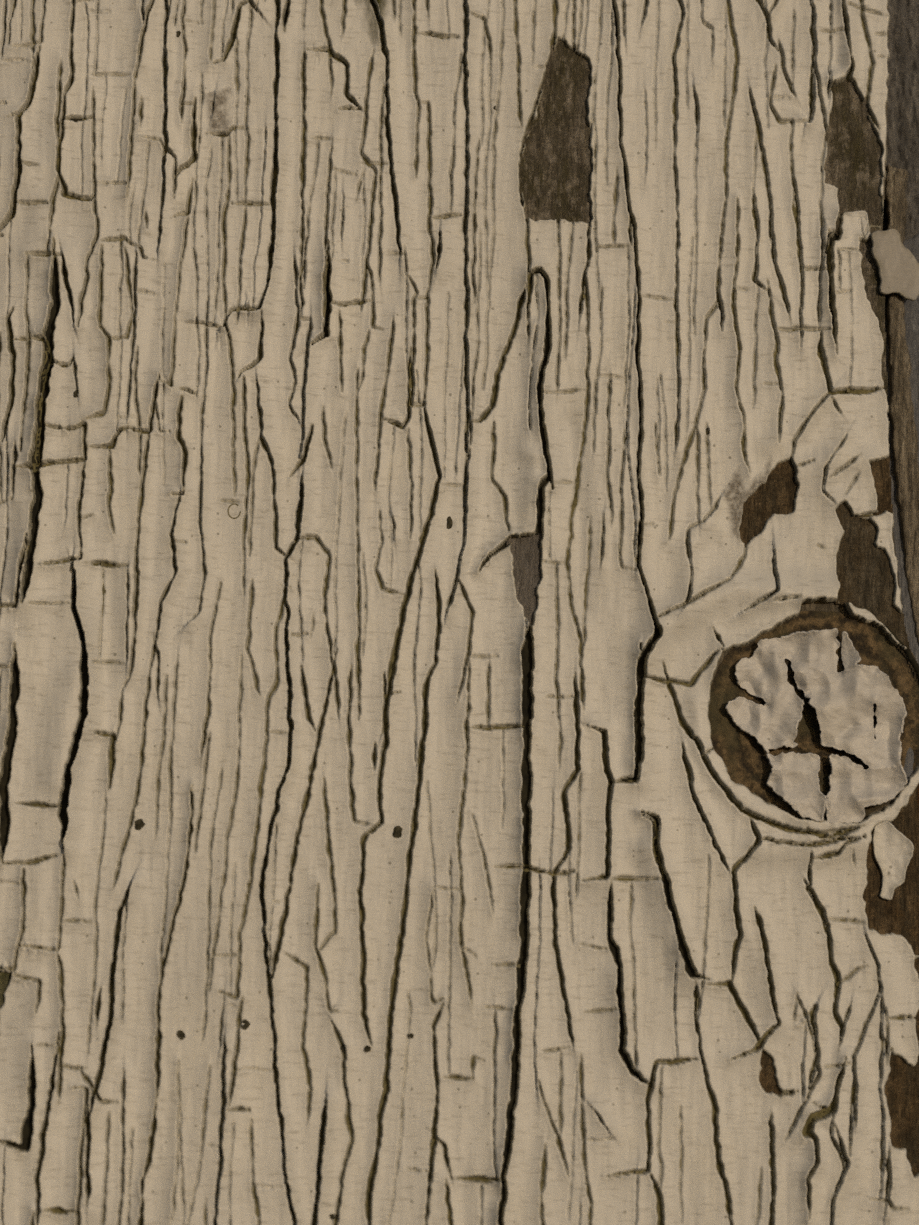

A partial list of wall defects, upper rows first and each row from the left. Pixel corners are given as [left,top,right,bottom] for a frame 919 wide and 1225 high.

peeling [519,38,592,224]
crack [704,0,888,458]
peeling [819,0,919,395]
crack [0,0,203,852]
crack [173,0,856,1225]
peeling [639,455,919,979]
crack [862,608,919,675]
crack [156,772,238,1079]
peeling [758,1046,785,1095]
crack [758,1002,888,1225]
crack [880,1110,892,1208]
peeling [884,1010,919,1176]